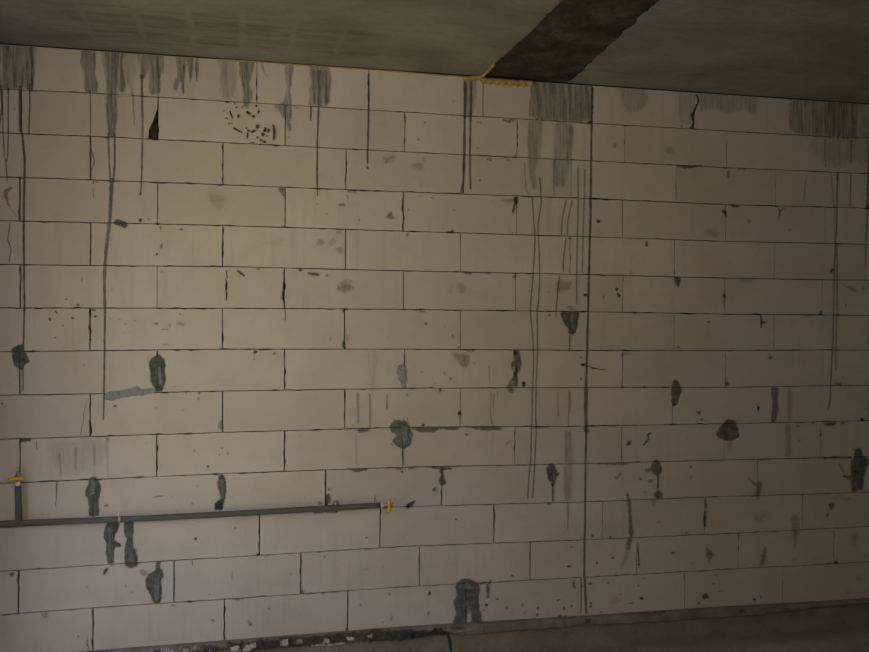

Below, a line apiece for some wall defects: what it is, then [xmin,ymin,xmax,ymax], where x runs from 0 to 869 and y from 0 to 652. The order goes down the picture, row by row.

water stain [0,45,34,344]
water stain [310,67,330,196]
water stain [460,81,472,193]
crack [681,94,699,129]